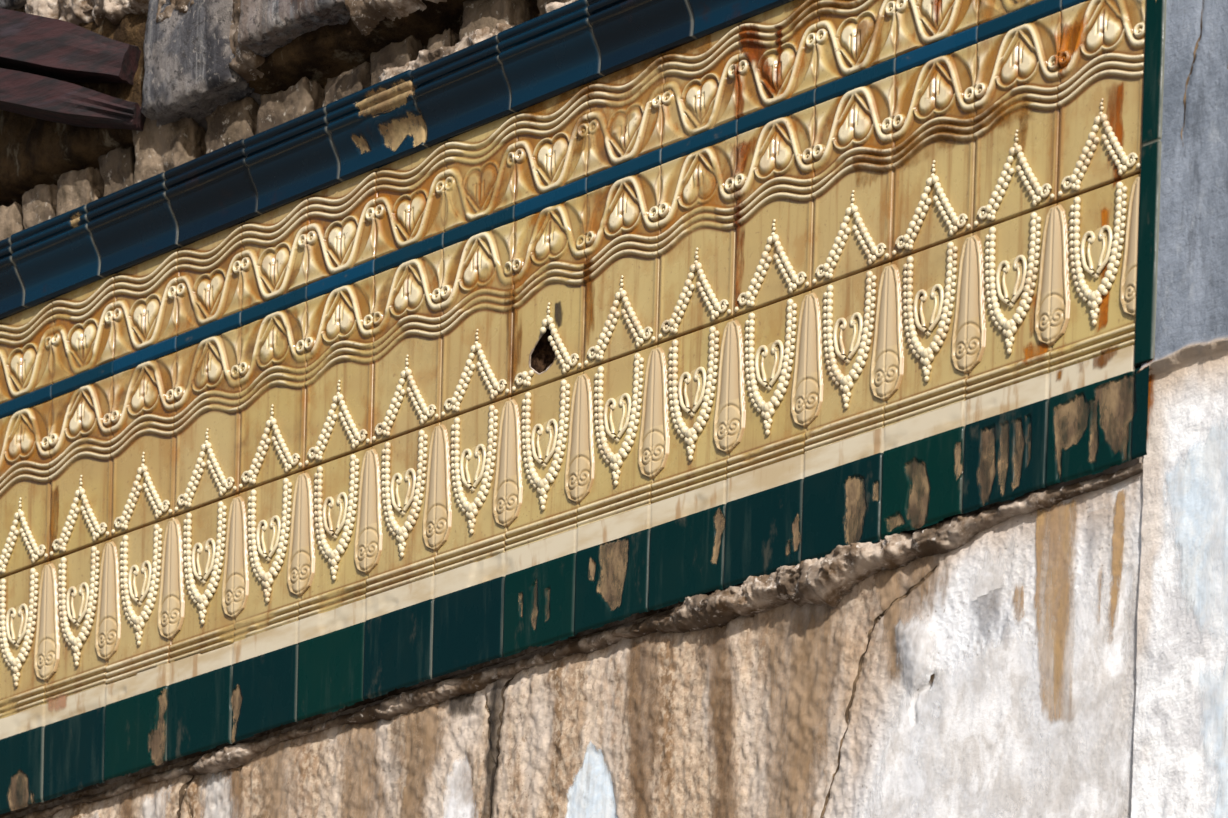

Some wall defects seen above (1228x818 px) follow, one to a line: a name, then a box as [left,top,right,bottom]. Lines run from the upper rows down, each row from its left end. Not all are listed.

spalling [356,79,427,151]
rust [734,139,756,173]
crack [1181,2,1204,138]
rust [734,192,744,307]
spalling [531,302,562,373]
spalling [1054,376,1134,475]
spalling [845,476,878,545]
spalling [589,539,628,610]
crack [820,566,937,818]
peeling [869,565,1134,818]
crack [177,776,194,818]
crack [485,678,513,818]